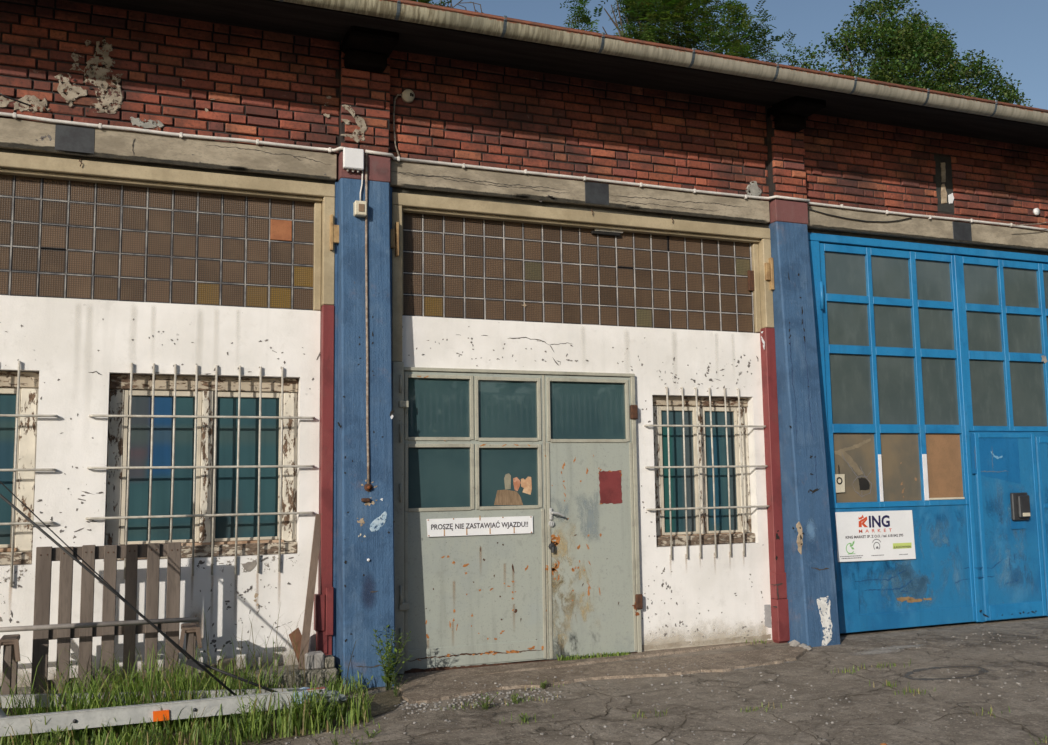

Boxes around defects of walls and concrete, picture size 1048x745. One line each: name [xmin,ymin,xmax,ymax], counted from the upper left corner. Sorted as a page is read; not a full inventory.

peeling [55,39,123,114]
peeling [0,95,51,113]
peeling [129,117,164,130]
peeling [340,105,368,143]
crack [458,334,571,365]
rust [545,533,602,601]
rust [404,555,546,673]
peeling [817,596,833,646]